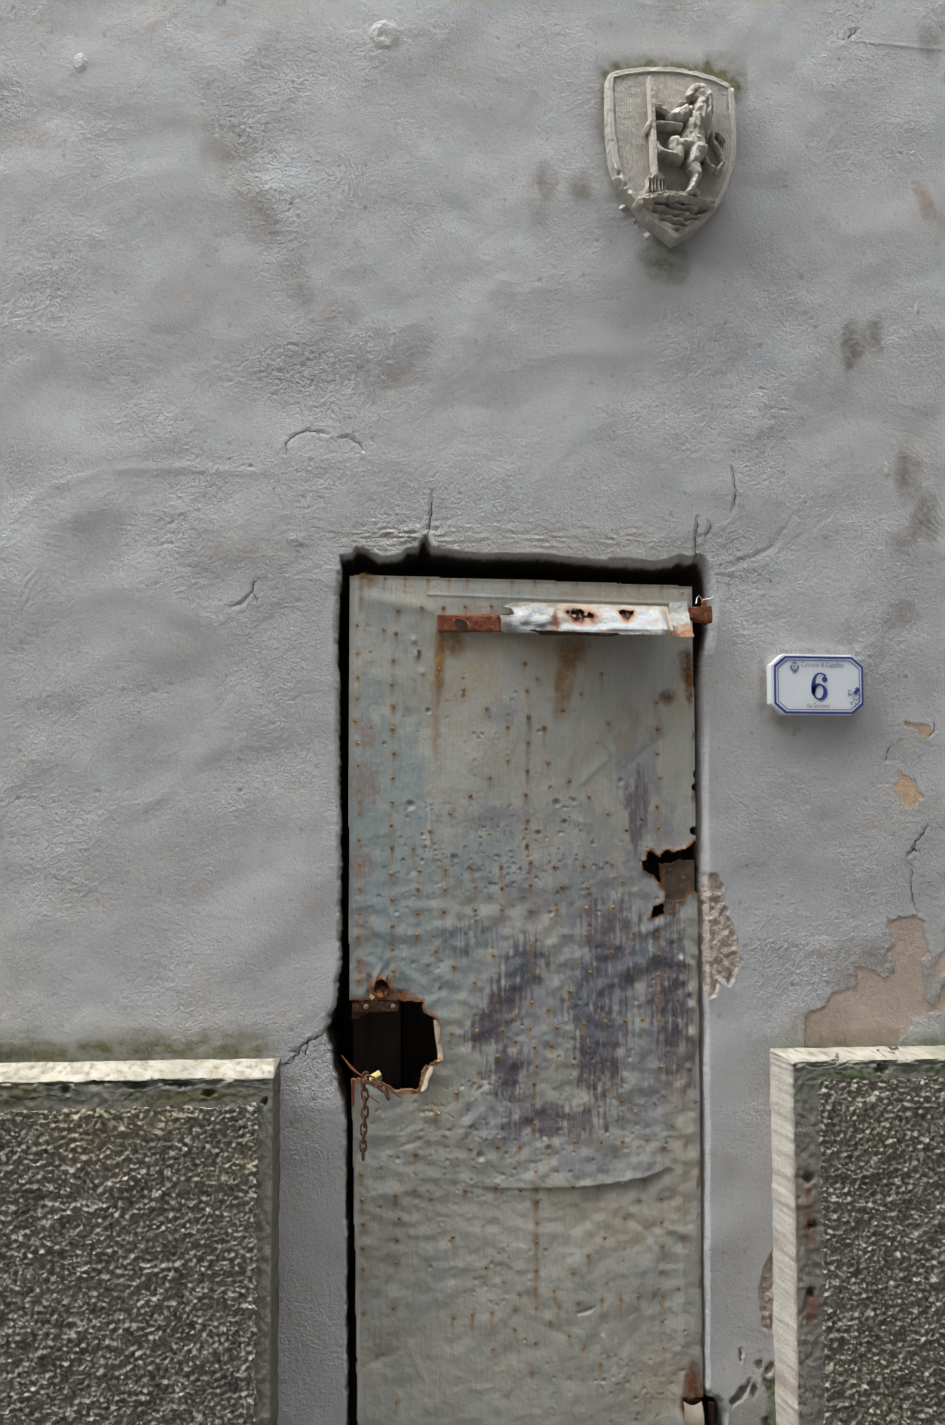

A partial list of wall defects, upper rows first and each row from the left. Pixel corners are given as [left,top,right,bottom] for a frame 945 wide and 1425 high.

corrosion [566,608,594,622]
corrosion [619,610,634,620]
peeling [896,721,931,744]
peeling [893,770,924,807]
flaking render [697,872,742,998]
peeling [804,915,945,1048]